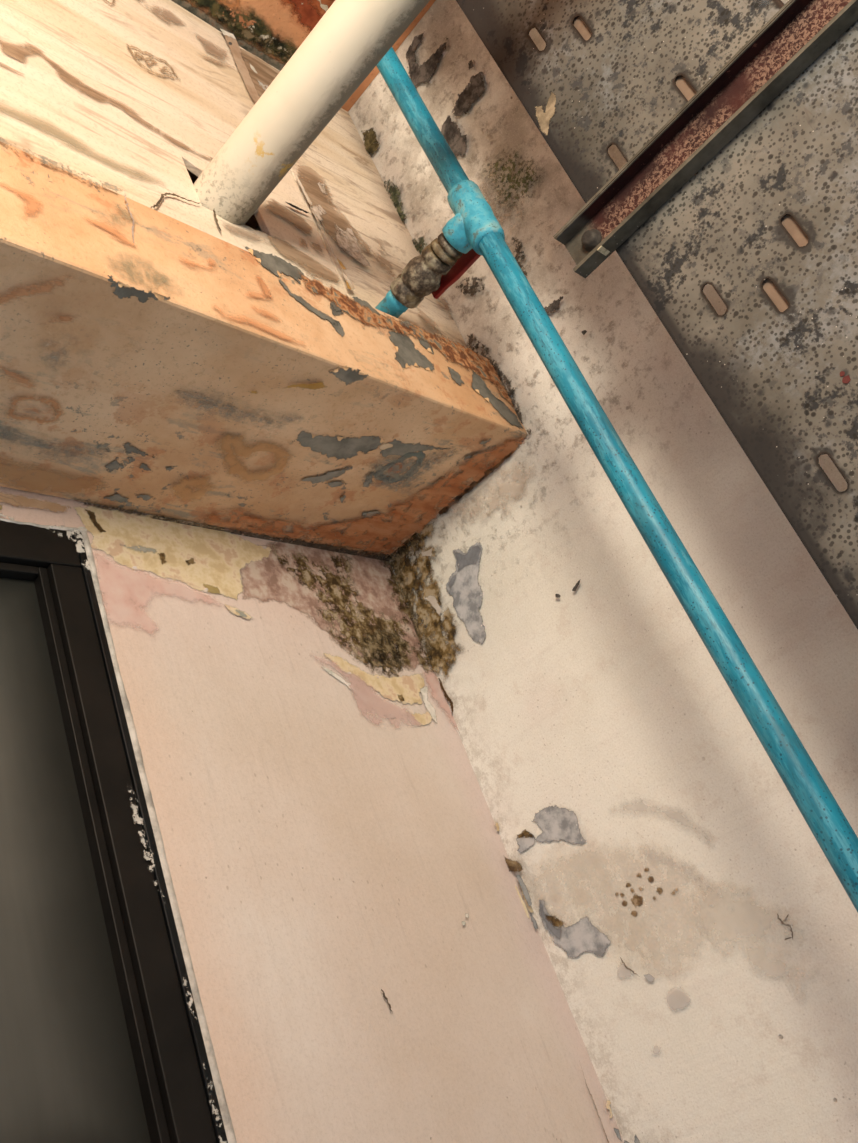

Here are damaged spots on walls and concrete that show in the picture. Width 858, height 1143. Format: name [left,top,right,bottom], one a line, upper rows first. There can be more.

peeling [171,0,285,71]
peeling [406,33,448,88]
peeling [441,60,485,158]
crack [124,190,221,242]
peeling [104,272,171,303]
flaking render [245,246,523,429]
peeling [292,431,450,503]
peeling [73,487,272,619]
damp [0,463,462,678]
peeling [446,542,486,644]
peeling [520,886,611,958]
damp [505,853,699,982]